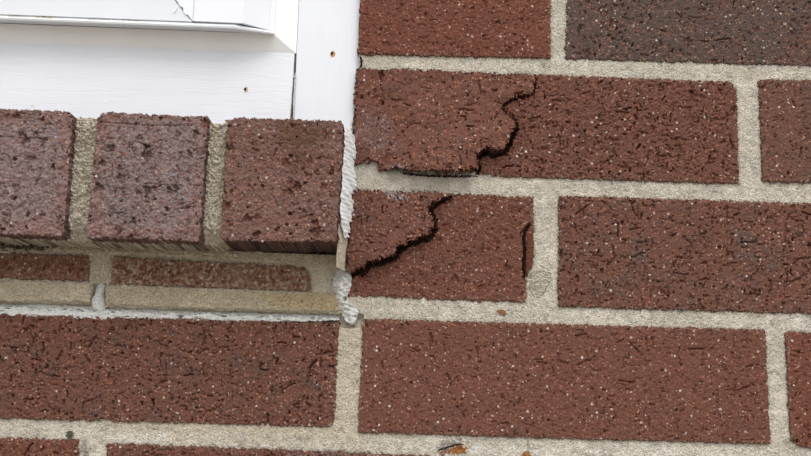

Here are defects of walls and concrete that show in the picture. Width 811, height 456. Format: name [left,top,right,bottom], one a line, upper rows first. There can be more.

crack [353,56,536,178]
crack [519,225,534,278]